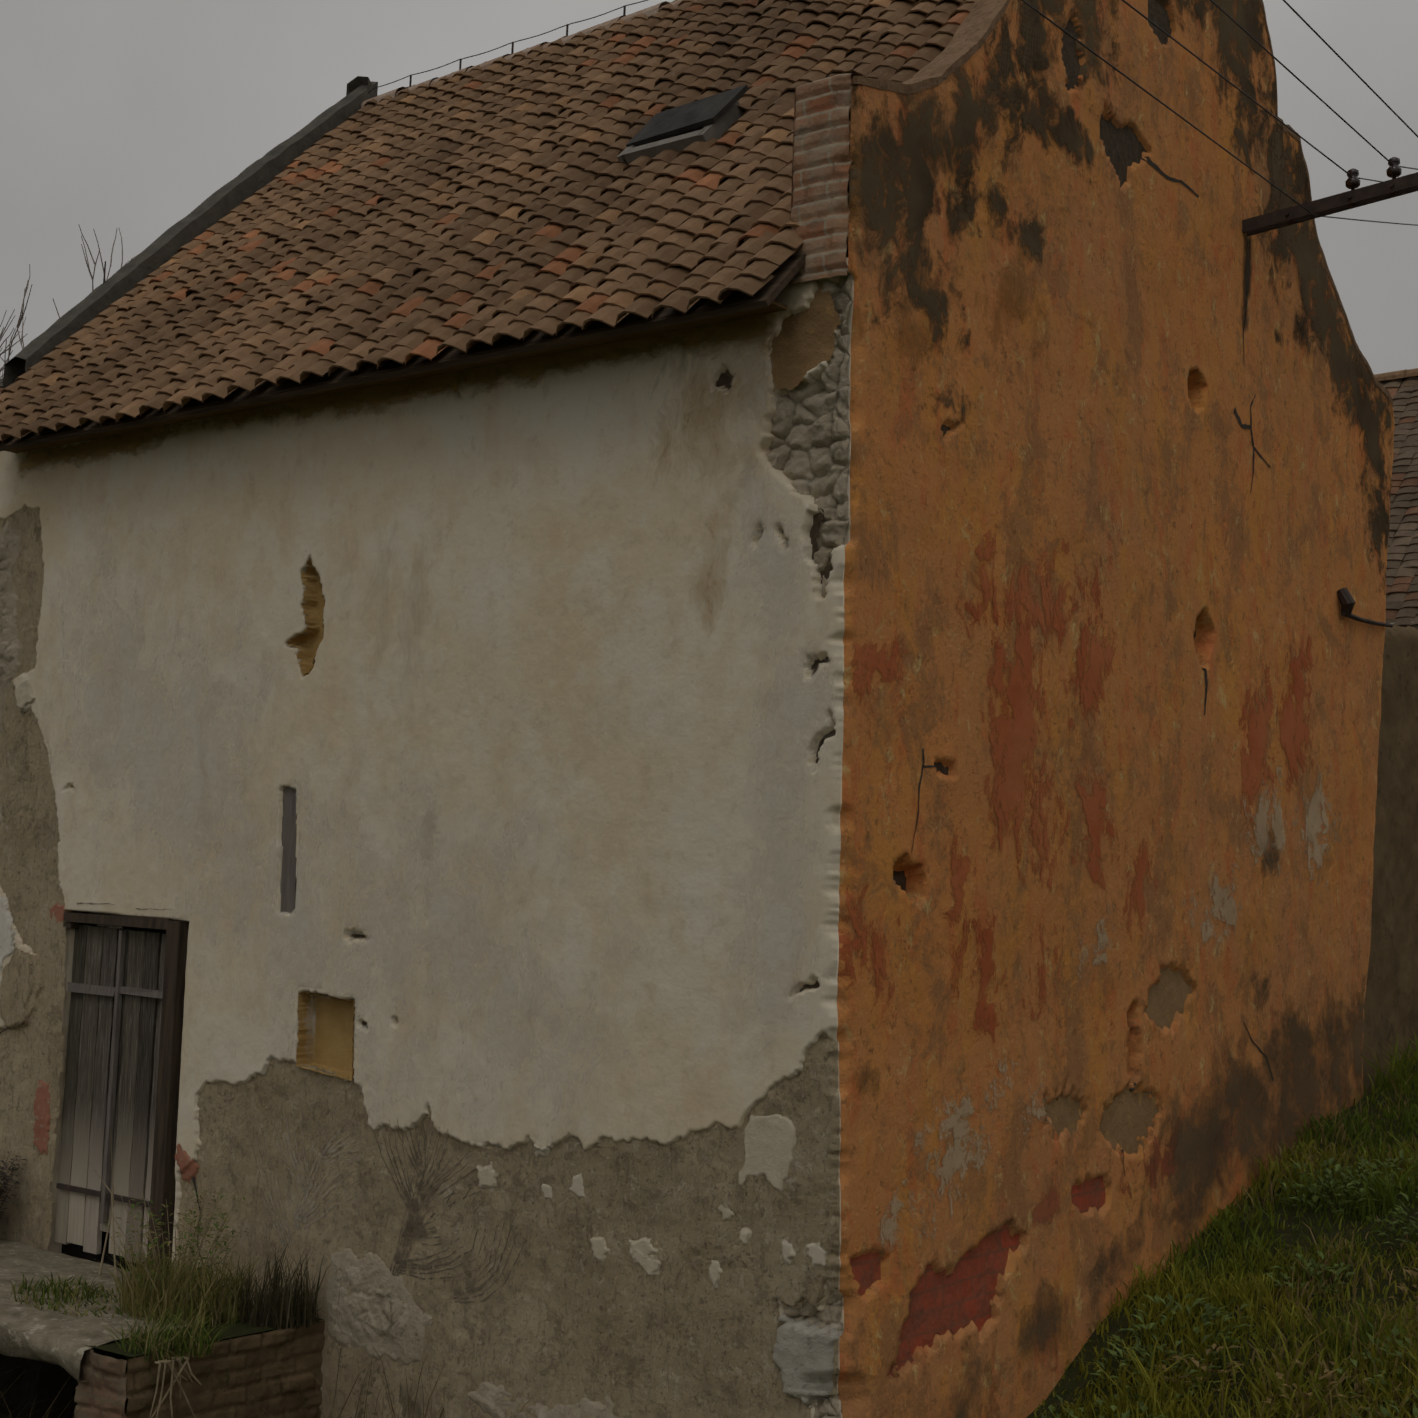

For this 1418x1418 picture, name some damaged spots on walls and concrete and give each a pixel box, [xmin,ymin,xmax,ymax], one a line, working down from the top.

water stain [1017,51,1095,169]
water stain [963,182,1047,263]
water stain [1242,235,1252,329]
spalling [766,272,853,598]
crack [1234,301,1271,493]
spalling [287,558,325,675]
spalling [0,506,79,1251]
peeling [1181,766,1340,954]
water stain [1140,989,1365,1237]
spalling [175,1032,1017,1418]
flaking render [887,1176,1132,1378]
water stain [1020,1289,1062,1351]